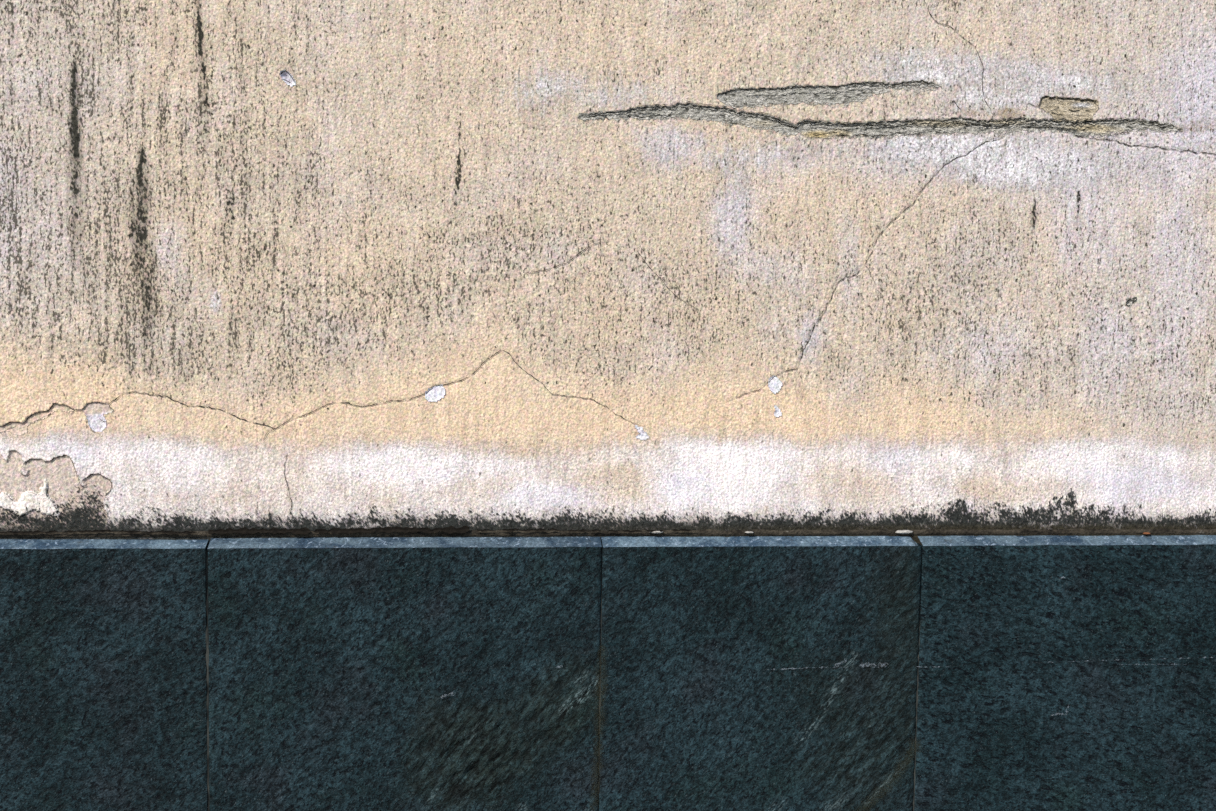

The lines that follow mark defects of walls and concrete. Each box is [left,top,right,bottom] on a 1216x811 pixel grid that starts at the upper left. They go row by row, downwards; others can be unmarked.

damp [67,61,82,246]
damp [128,144,157,368]
damp [196,6,210,130]
crack [733,0,1003,399]
spalling [578,79,1183,140]
crack [1071,132,1216,155]
peeling [0,450,112,529]
peeling [0,402,114,435]
crack [109,350,636,513]
damp [0,432,1216,549]